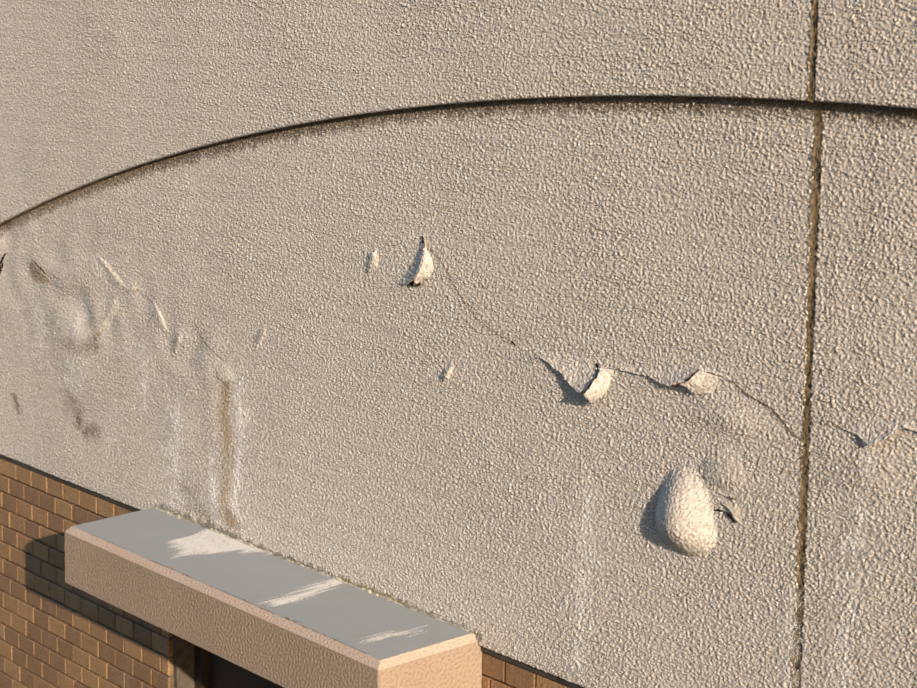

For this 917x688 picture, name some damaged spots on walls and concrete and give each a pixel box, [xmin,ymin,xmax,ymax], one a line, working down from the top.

peeling [396,235,434,287]
peeling [529,349,733,405]
leakage [30,291,263,537]
peeling [843,418,917,447]